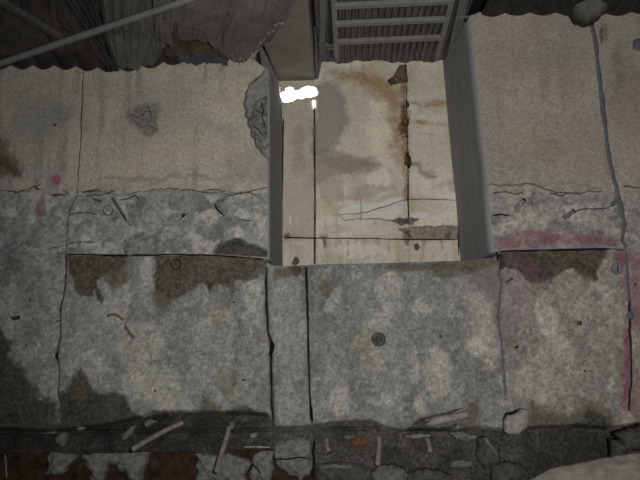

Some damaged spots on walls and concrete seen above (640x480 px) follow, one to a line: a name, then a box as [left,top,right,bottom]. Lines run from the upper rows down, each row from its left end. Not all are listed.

spalling [243,68,269,159]
water stain [66,255,130,306]
water stain [140,239,267,305]
crack [9,72,464,426]
water stain [391,250,606,282]
crack [496,0,635,412]